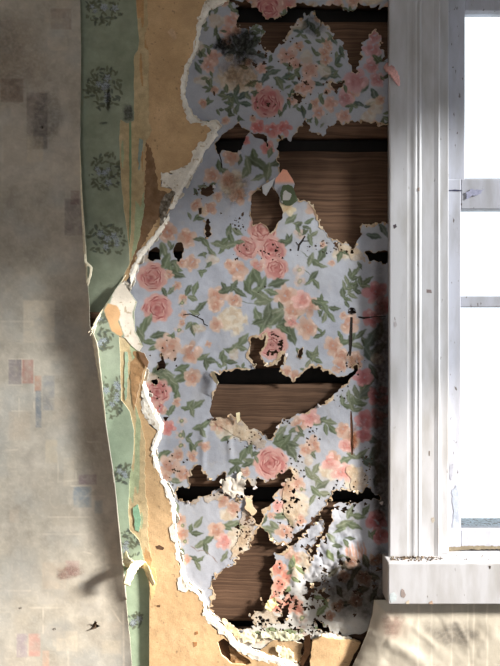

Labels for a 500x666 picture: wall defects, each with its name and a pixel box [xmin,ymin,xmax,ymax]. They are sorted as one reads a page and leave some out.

damp [214,29,258,83]
peeling [130,143,167,268]
peeling [332,241,366,262]
peeling [209,414,267,450]
peeling [180,486,227,505]
peeling [282,477,299,528]
peeling [346,466,368,494]
peeling [169,522,177,543]
peeling [230,510,256,560]
peeling [123,551,157,599]
peeling [177,576,192,592]
peeling [252,606,291,628]